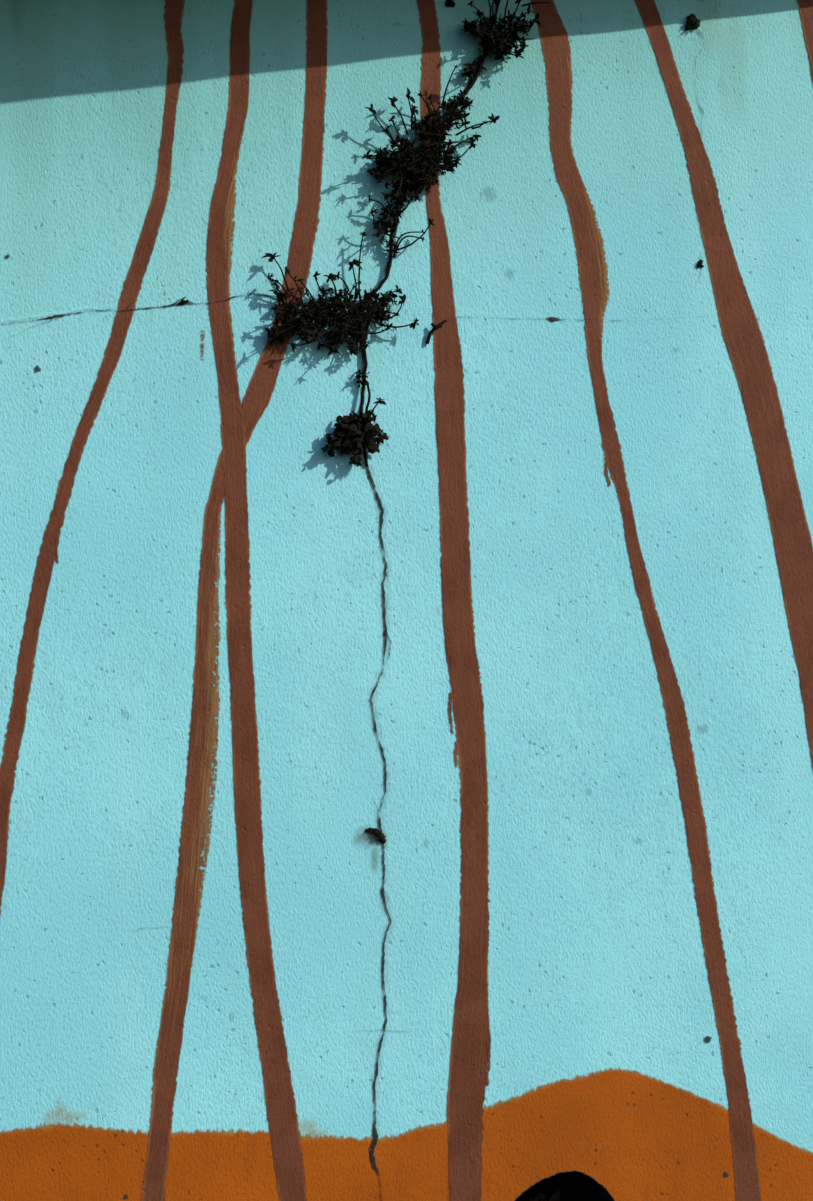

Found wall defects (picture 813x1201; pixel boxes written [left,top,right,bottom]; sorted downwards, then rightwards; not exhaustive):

crack [447,0,501,122]
crack [0,294,292,341]
crack [361,213,398,410]
crack [364,443,391,1201]